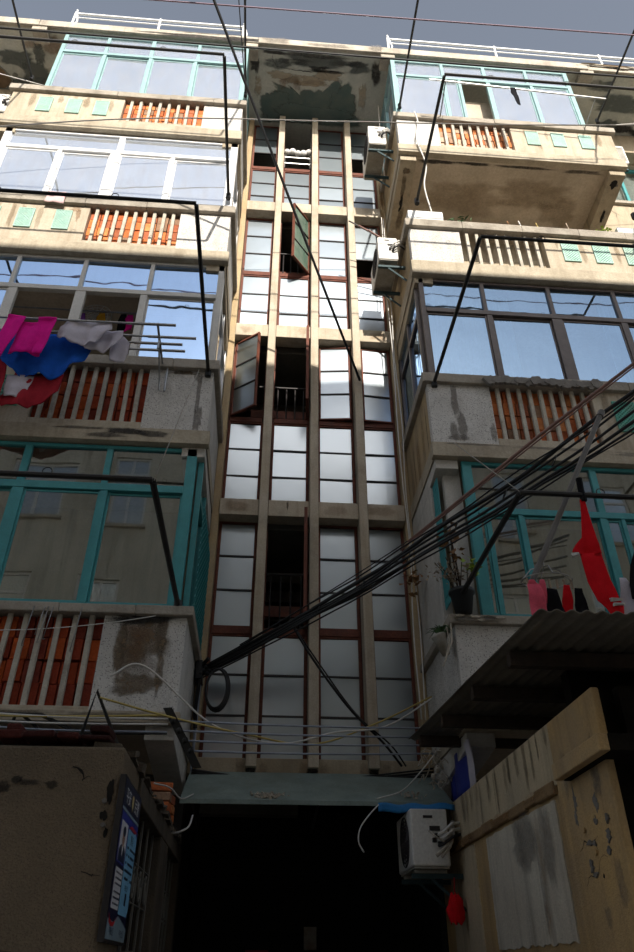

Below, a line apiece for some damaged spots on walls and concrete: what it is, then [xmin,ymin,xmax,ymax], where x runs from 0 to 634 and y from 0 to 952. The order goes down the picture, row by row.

damp [0,44,49,85]
damp [140,31,380,127]
damp [591,81,634,136]
damp [420,160,549,170]
damp [449,387,497,445]
damp [113,615,174,695]
peeling [572,787,613,878]